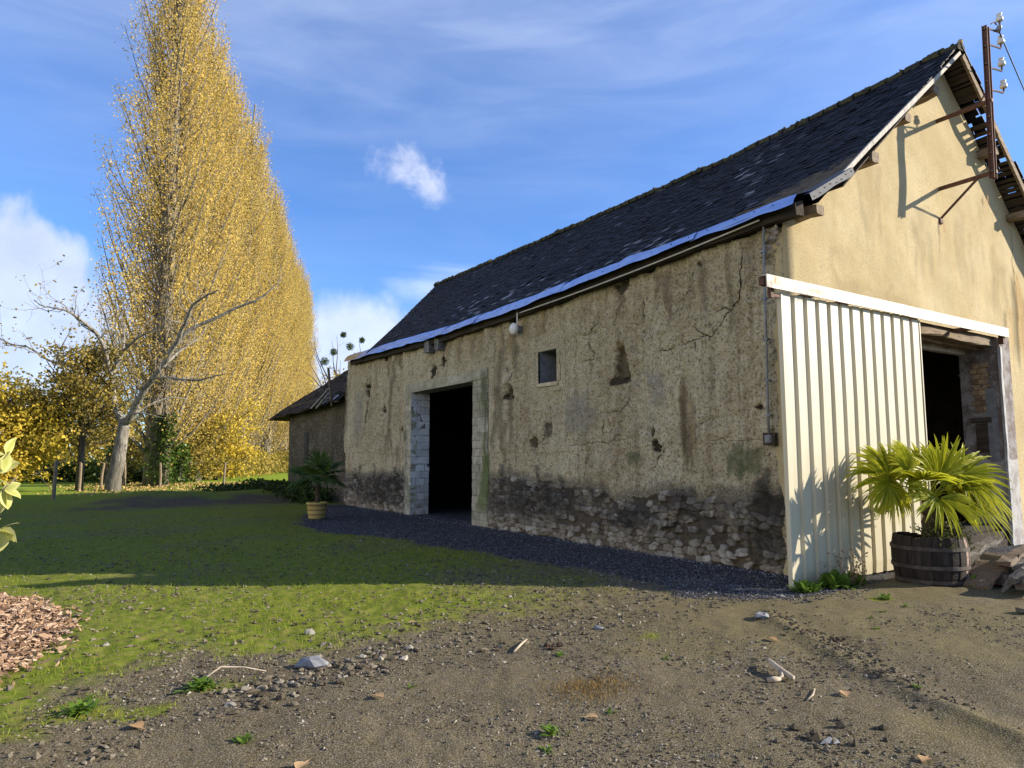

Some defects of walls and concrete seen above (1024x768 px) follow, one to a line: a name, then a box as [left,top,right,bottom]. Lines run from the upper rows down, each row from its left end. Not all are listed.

crack [660,250,746,351]
peeling [500,368,515,402]
spalling [609,344,631,386]
spalling [651,427,664,456]